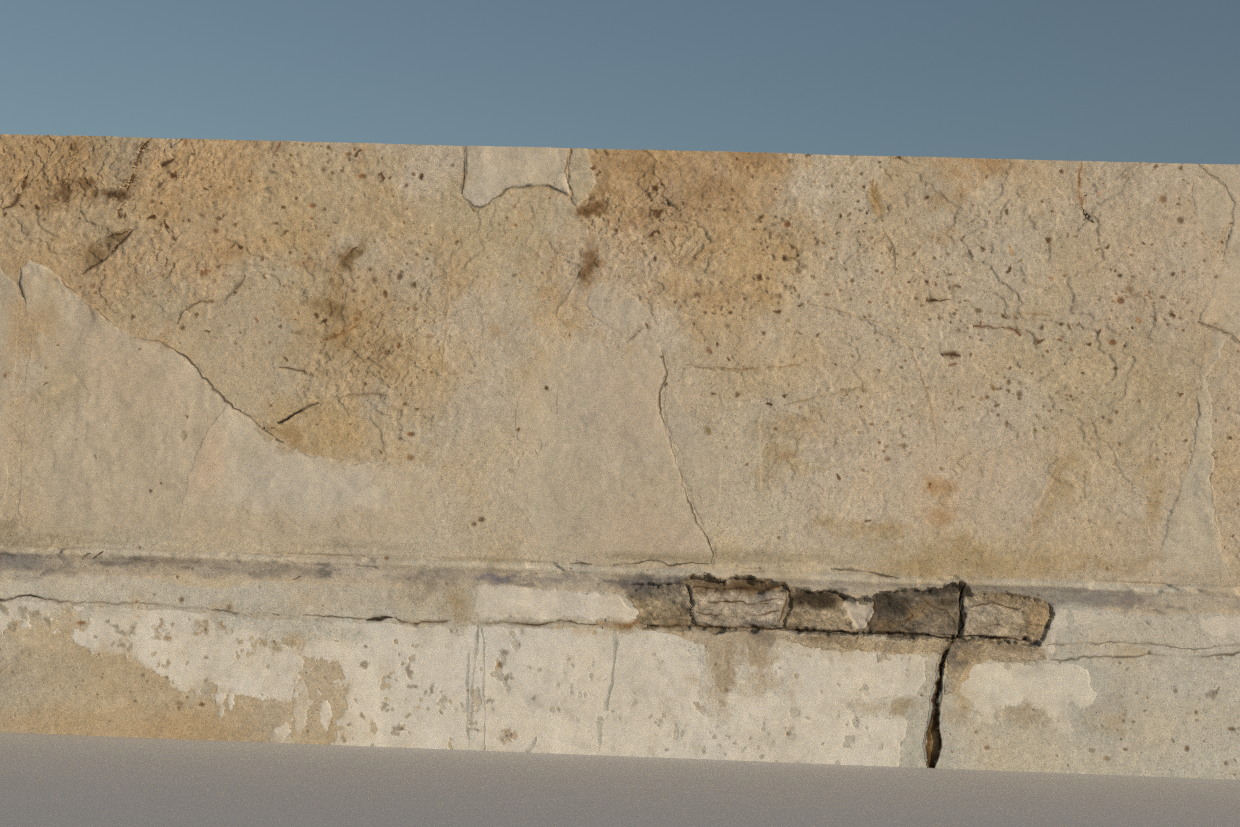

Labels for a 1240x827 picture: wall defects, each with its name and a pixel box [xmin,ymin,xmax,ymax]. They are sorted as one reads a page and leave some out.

spalling [378,171,426,189]
peeling [451,146,602,204]
spalling [639,183,678,263]
peeling [1198,164,1240,338]
peeling [0,260,441,550]
crack [570,325,800,568]
crack [757,386,862,486]
crack [82,551,104,568]
peeling [0,321,1109,767]
crack [0,593,640,635]
crack [1047,640,1240,663]
crack [923,637,980,768]